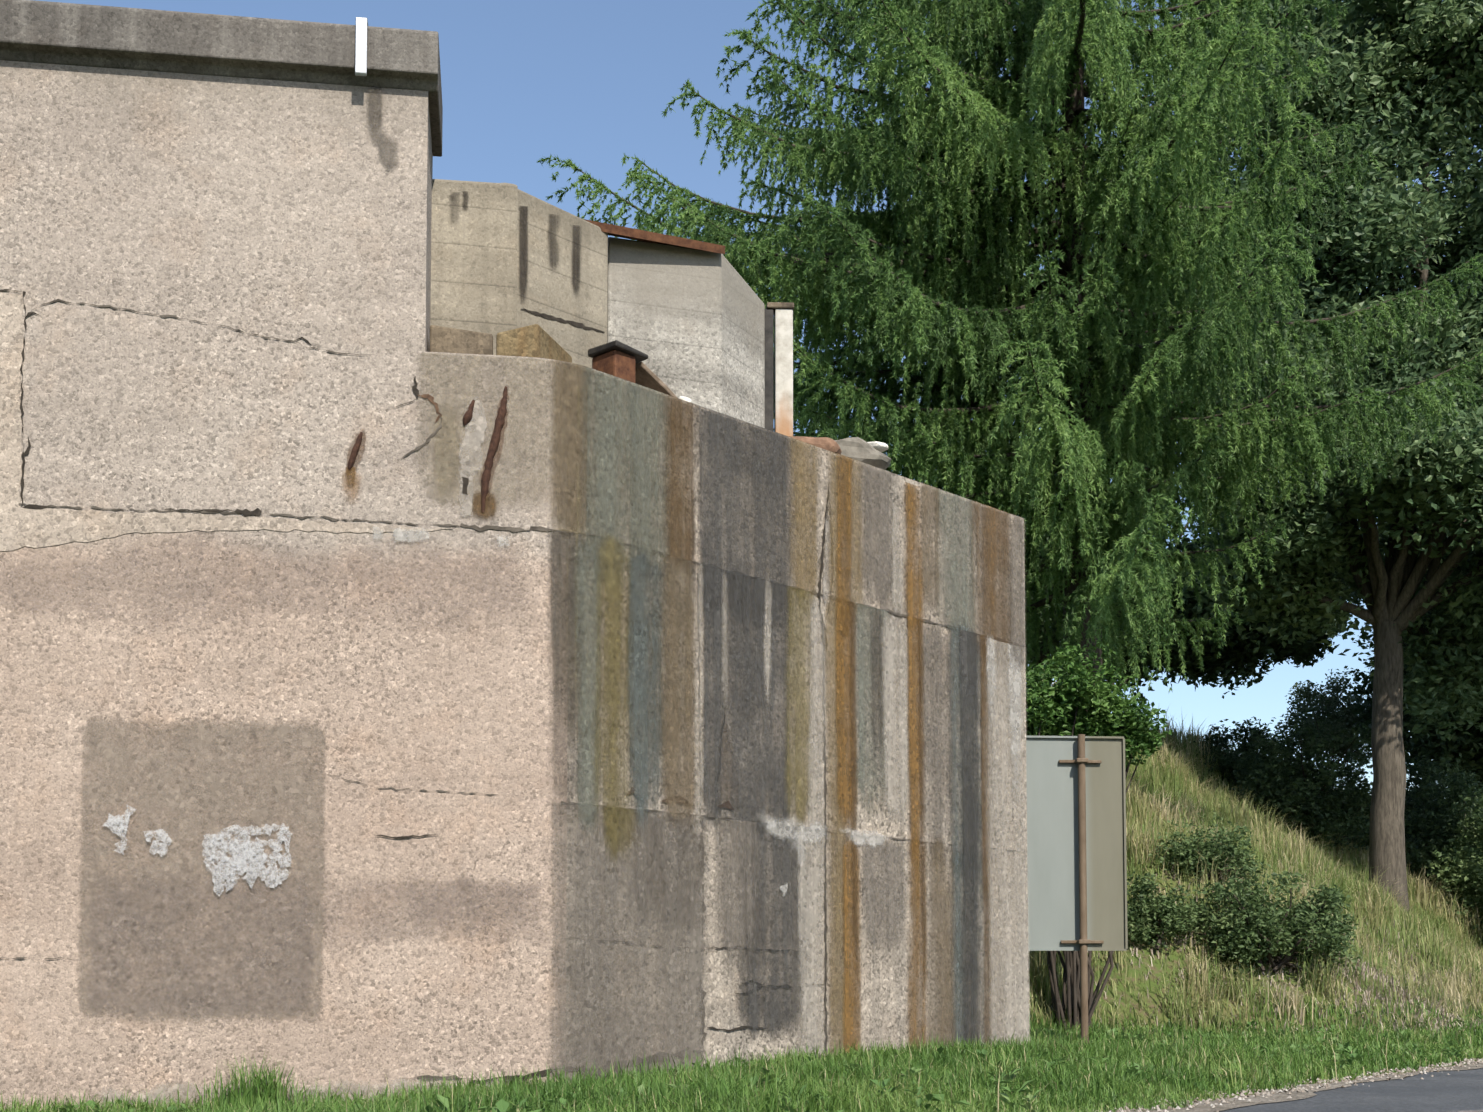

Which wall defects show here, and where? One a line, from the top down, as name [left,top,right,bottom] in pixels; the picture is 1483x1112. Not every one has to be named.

water stain [370,87,396,168]
crack [0,289,369,509]
crack [164,508,262,517]
crack [384,376,442,459]
water stain [424,353,516,501]
spalling [459,386,509,518]
water stain [490,357,825,1080]
rust [787,438,862,1057]
water stain [858,464,907,810]
rust [905,482,926,1049]
water stain [922,483,1029,1048]
water stain [852,831,904,945]